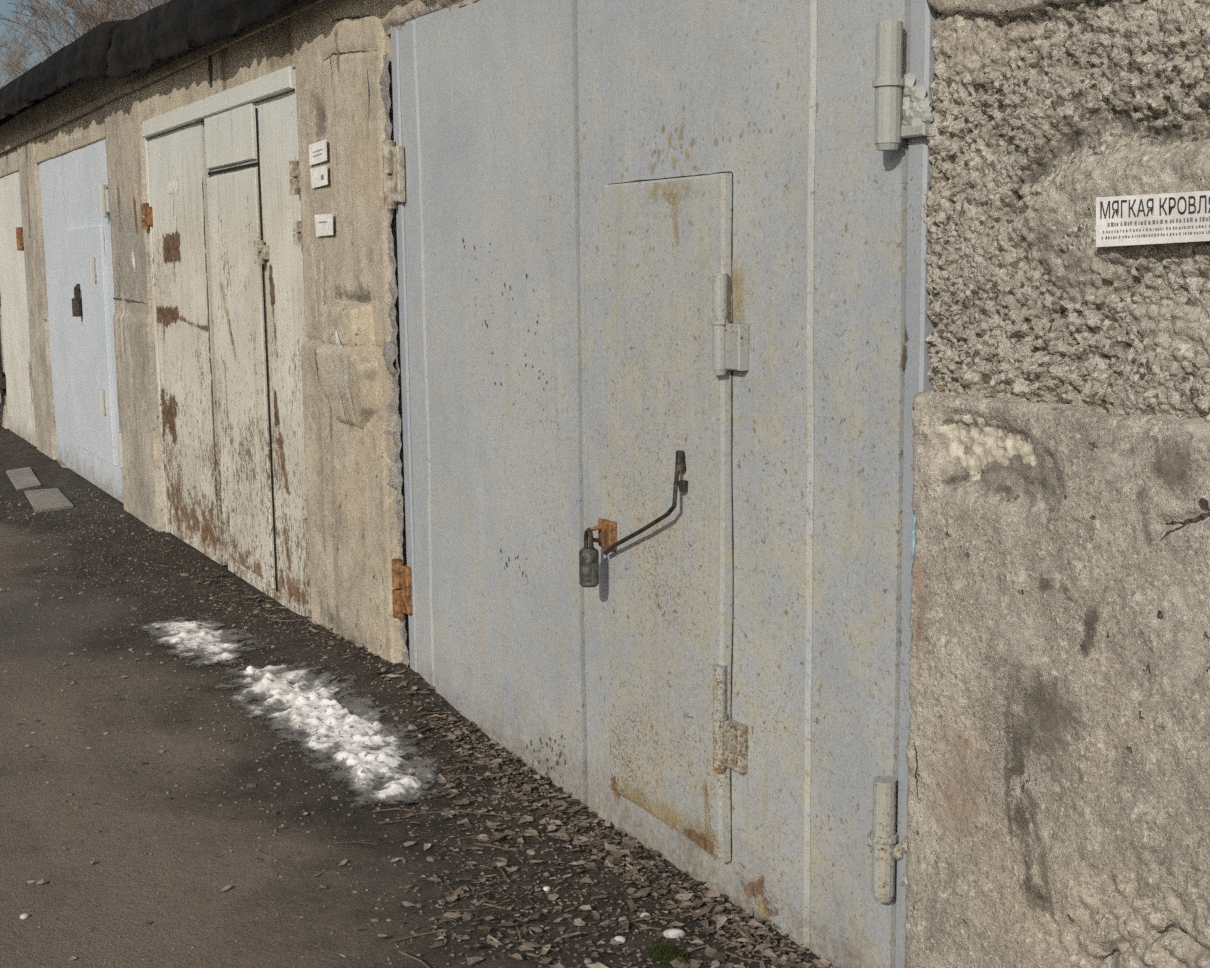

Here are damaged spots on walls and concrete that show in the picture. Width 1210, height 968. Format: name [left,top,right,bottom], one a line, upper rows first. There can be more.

crack [323,50,378,120]
damp [1007,111,1210,213]
spalling [923,0,1210,422]
peeling [162,231,181,281]
corrosion [156,169,235,480]
peeling [161,389,179,443]
spalling [933,415,1054,499]
crack [1161,509,1210,540]
corrosion [611,775,715,855]
damp [1004,676,1070,916]
corrosion [736,872,778,920]
crack [1099,916,1210,968]